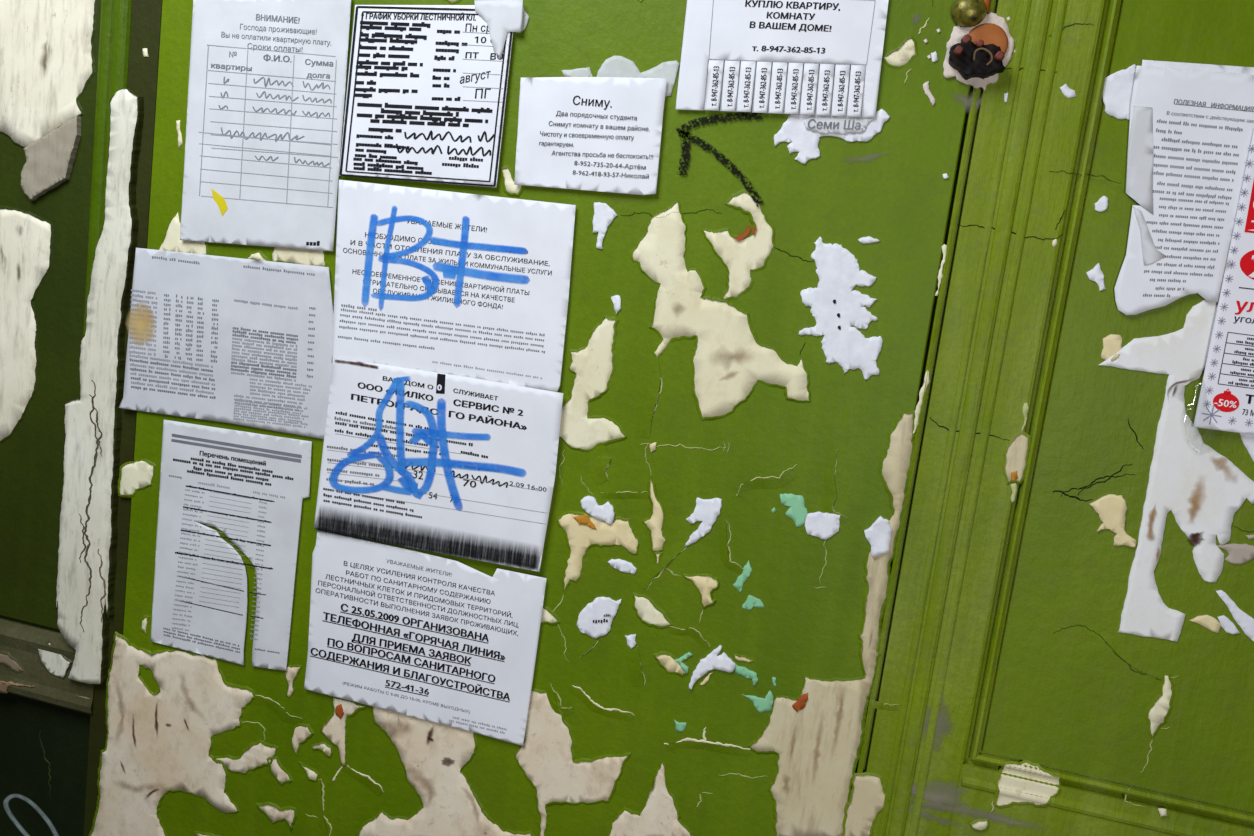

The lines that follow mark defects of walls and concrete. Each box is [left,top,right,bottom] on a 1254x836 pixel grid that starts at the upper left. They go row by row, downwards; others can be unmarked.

peeling [0,0,98,444]
peeling [630,189,811,421]
peeling [36,87,693,836]
peeling [1002,403,1031,503]
crack [1053,420,1143,502]
peeling [682,573,720,609]
peeling [747,370,929,836]
peeling [0,651,24,674]
crack [1054,624,1179,680]
peeling [1144,672,1175,739]
peeling [969,760,1062,831]
crack [1125,727,1169,807]